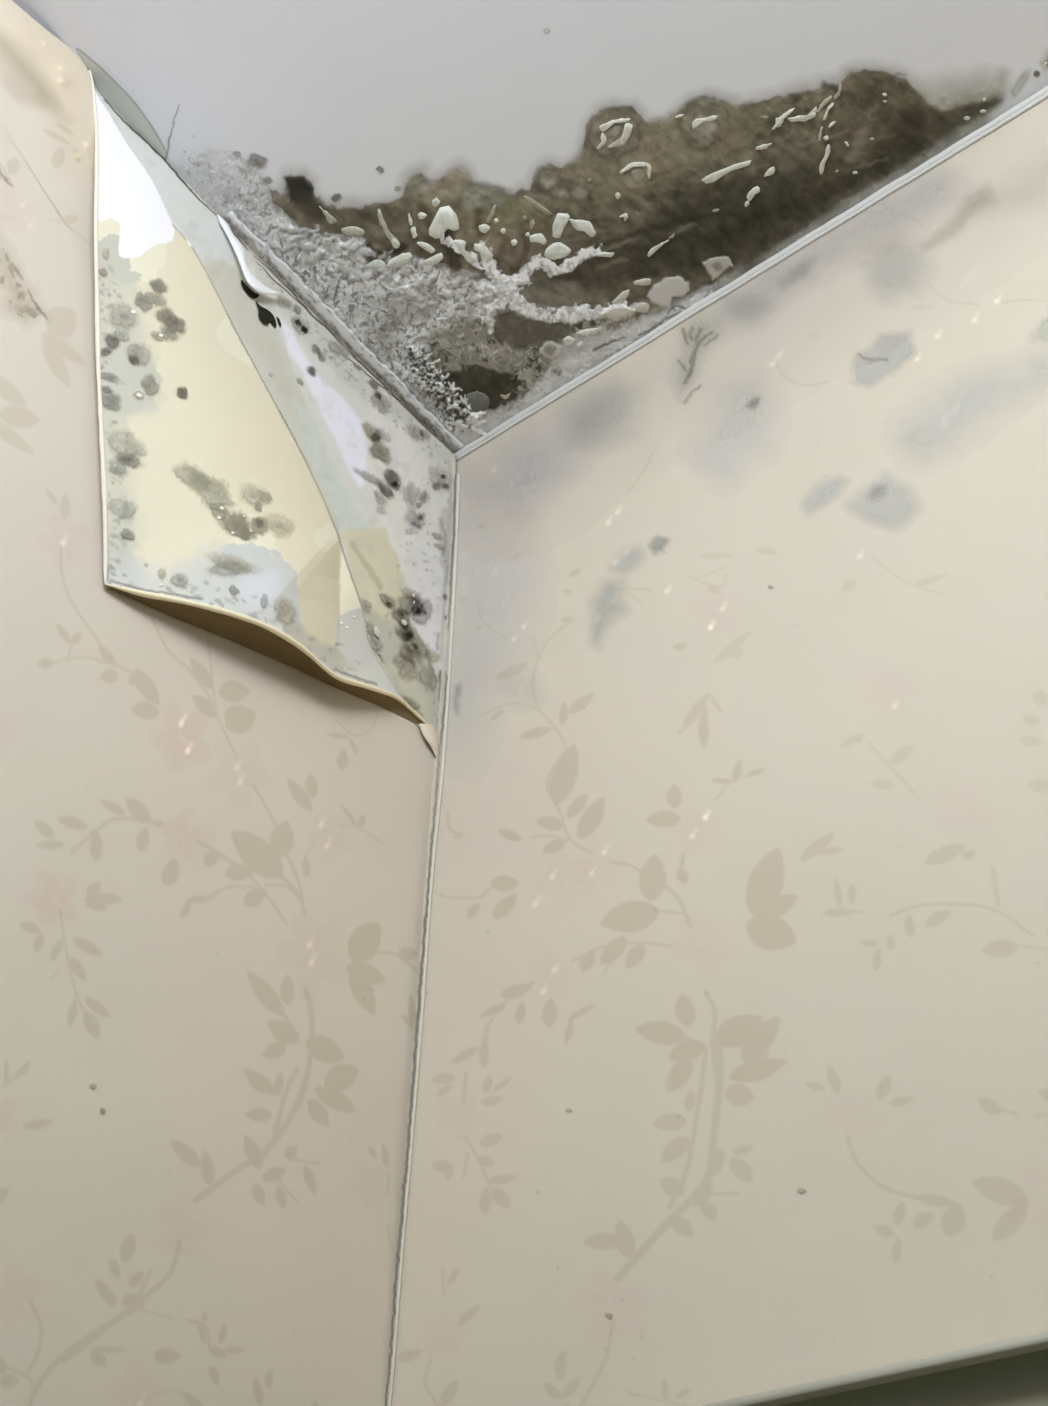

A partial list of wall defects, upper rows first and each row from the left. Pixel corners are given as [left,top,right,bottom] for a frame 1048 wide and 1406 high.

mould [0,254,45,317]
leakage [174,60,1048,550]
mould [101,279,185,410]
peeling [77,49,456,731]
mould [109,432,145,473]
mould [112,499,135,539]
leakage [159,569,187,586]
mould [210,556,251,595]
mould [261,594,296,623]
mould [361,588,447,689]